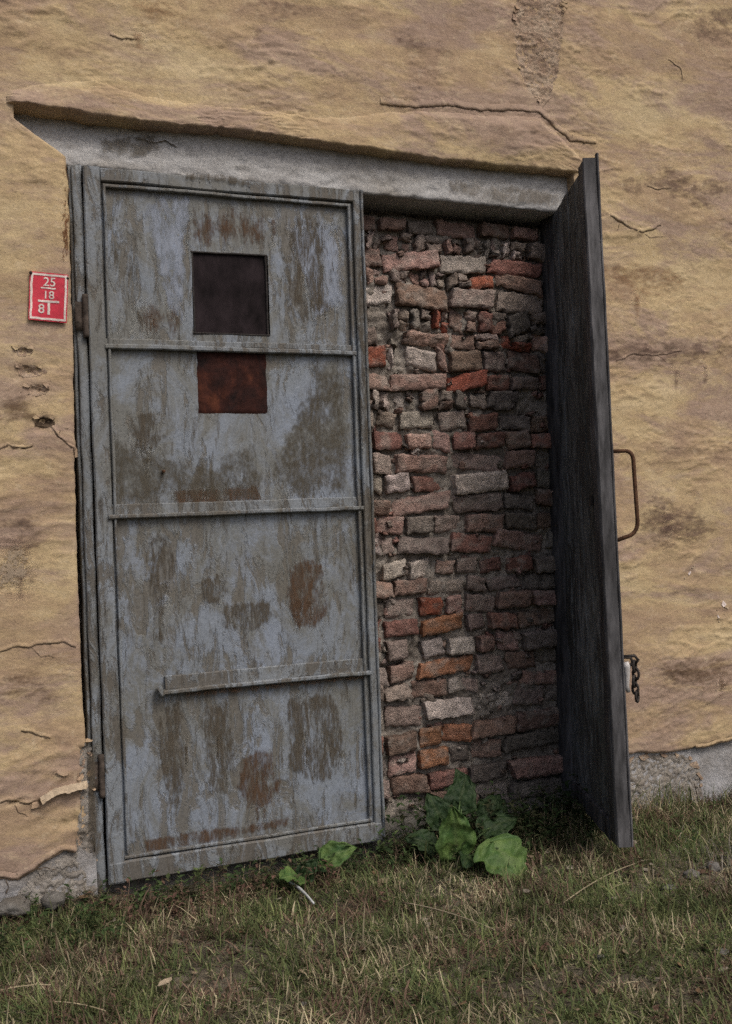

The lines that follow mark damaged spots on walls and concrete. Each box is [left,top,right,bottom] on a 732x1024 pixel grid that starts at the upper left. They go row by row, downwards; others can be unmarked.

flaking render [512,0,569,104]
crack [380,97,596,144]
crack [610,212,665,238]
flaking render [12,346,49,396]
crack [0,441,33,449]
flaking render [32,415,55,428]
crack [51,425,78,457]
corrosion [288,561,326,629]
crack [0,638,77,657]
flaking render [18,738,101,904]
corrosion [146,752,287,852]
flaking render [629,752,703,809]